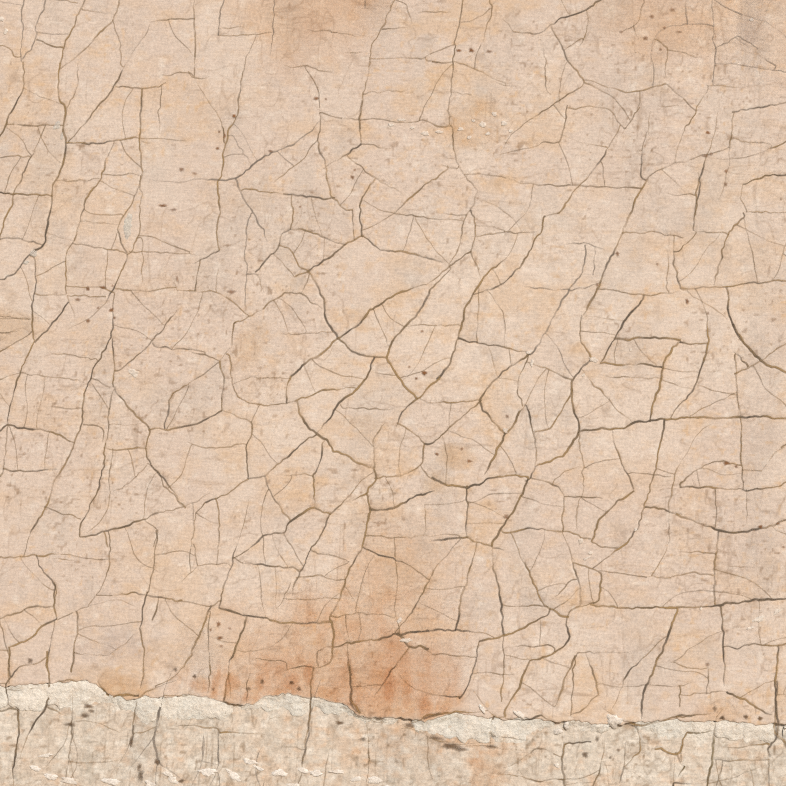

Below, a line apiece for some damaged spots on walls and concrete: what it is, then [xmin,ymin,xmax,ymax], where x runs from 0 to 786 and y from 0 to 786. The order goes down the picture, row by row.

crack [531,0,666,122]
crack [175,84,419,277]
crack [599,165,656,214]
crack [673,133,786,288]
crack [0,0,223,772]
crack [182,179,786,594]
spalling [0,680,398,725]
spalling [407,704,623,750]
spalling [635,715,786,744]
peeling [29,753,77,785]
peeling [197,768,241,782]
peeling [243,758,300,786]